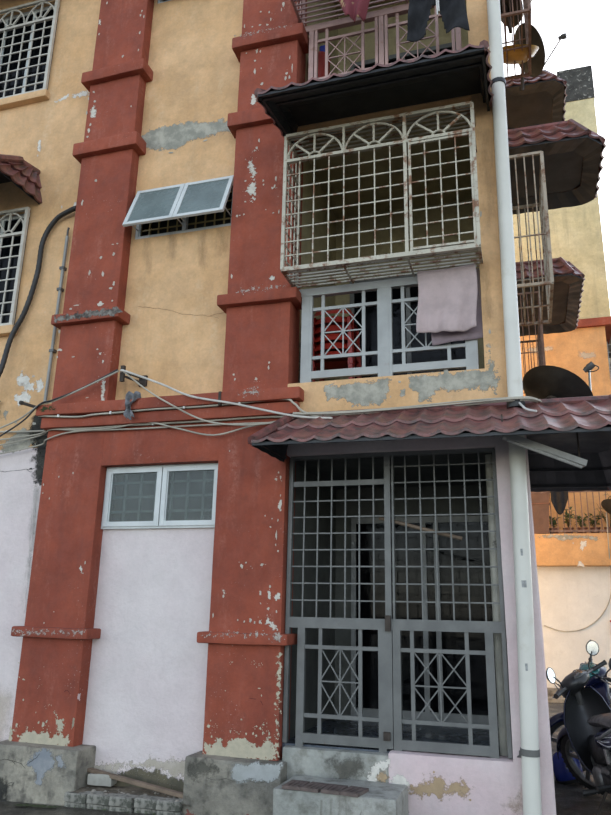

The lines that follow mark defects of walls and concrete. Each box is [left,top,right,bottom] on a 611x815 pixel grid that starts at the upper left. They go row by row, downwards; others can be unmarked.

peeling [141,118,232,153]
peeling [244,139,277,203]
peeling [14,370,44,407]
peeling [324,344,501,407]
peeling [8,704,75,746]
peeling [203,652,285,760]
damp [113,758,219,792]
peeling [367,758,471,801]